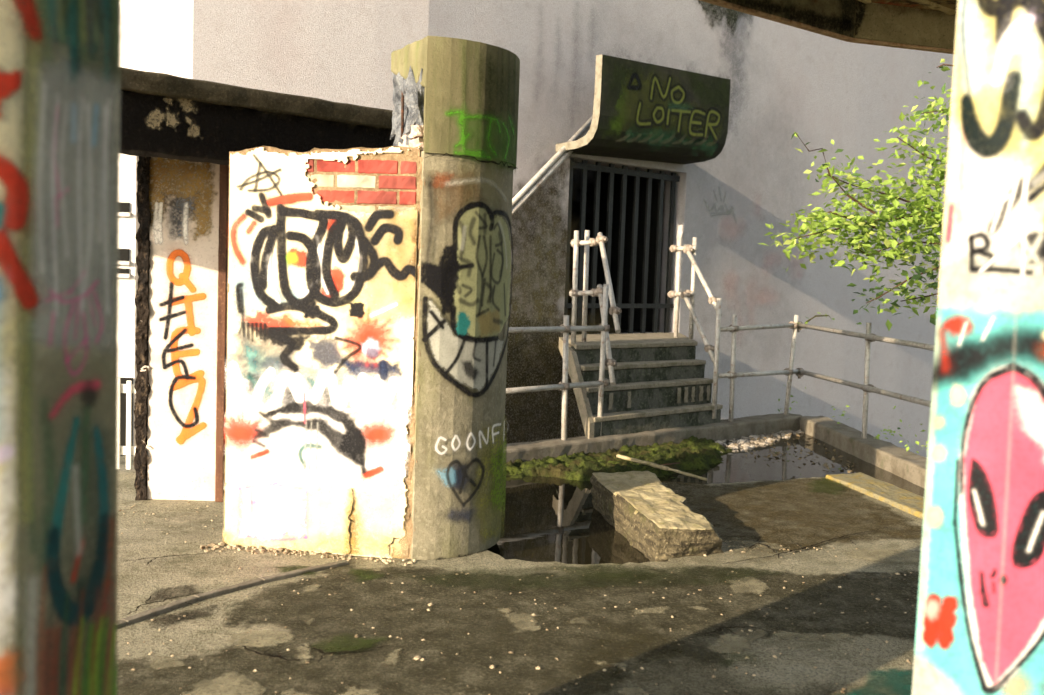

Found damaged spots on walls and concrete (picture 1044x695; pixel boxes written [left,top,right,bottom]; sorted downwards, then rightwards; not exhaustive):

peeling [146,98,199,137]
spalling [305,66,425,213]
crack [347,488,355,555]
water stain [663,478,923,556]
water stain [117,538,920,695]